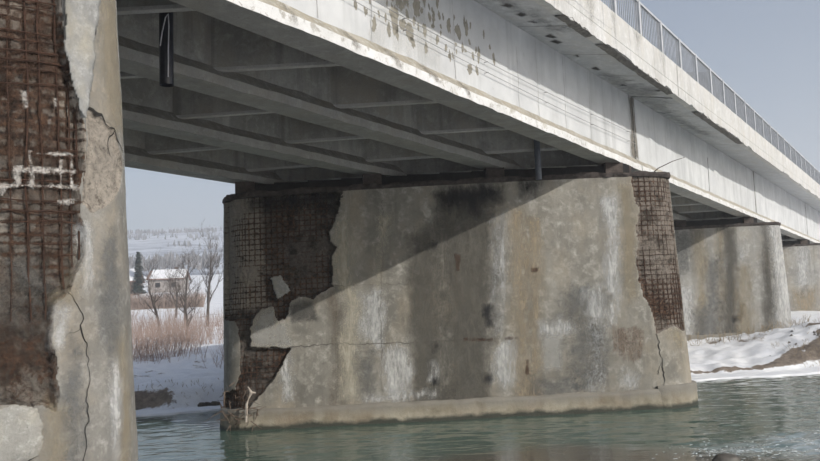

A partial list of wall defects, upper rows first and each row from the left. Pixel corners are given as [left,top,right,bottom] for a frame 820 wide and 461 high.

spalling [0,0,123,412]
crack [67,292,90,461]
crack [88,107,124,159]
spalling [224,191,343,410]
leakage [280,359,293,398]
leakage [335,186,514,401]
leakage [533,198,621,394]
spalling [631,177,685,334]
crack [656,334,665,383]